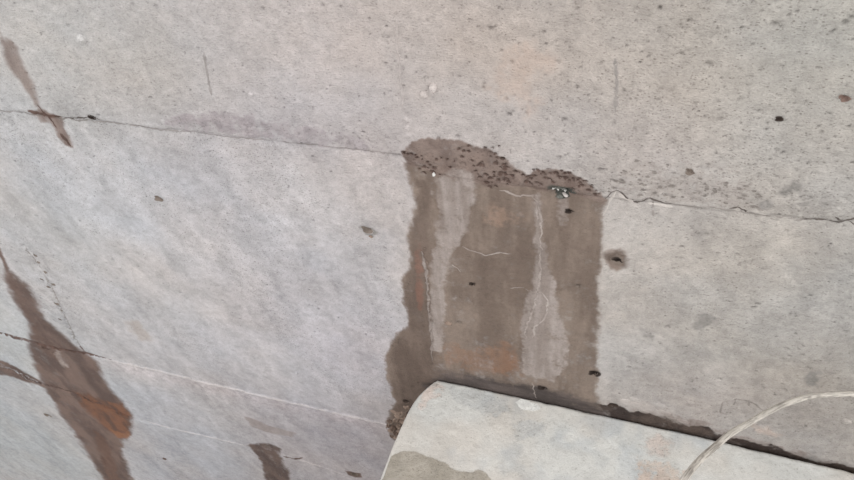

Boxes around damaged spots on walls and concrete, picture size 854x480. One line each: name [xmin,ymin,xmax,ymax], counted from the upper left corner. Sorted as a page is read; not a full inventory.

crack [603,190,854,225]
water stain [381,135,854,474]
rust [69,389,138,441]
water stain [382,450,491,480]